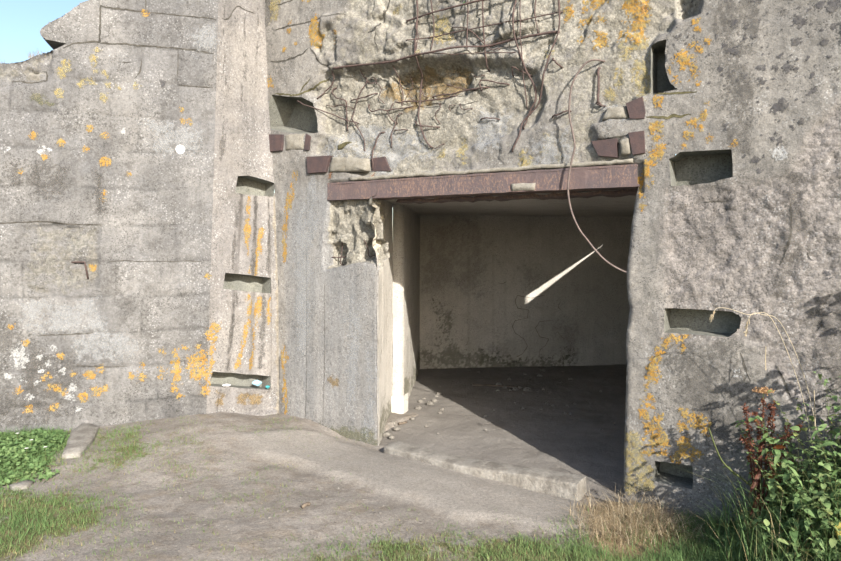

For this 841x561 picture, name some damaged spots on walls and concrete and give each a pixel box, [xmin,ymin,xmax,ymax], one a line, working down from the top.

spalling [297,0,712,177]
spalling [323,199,390,269]
crack [500,282,561,360]